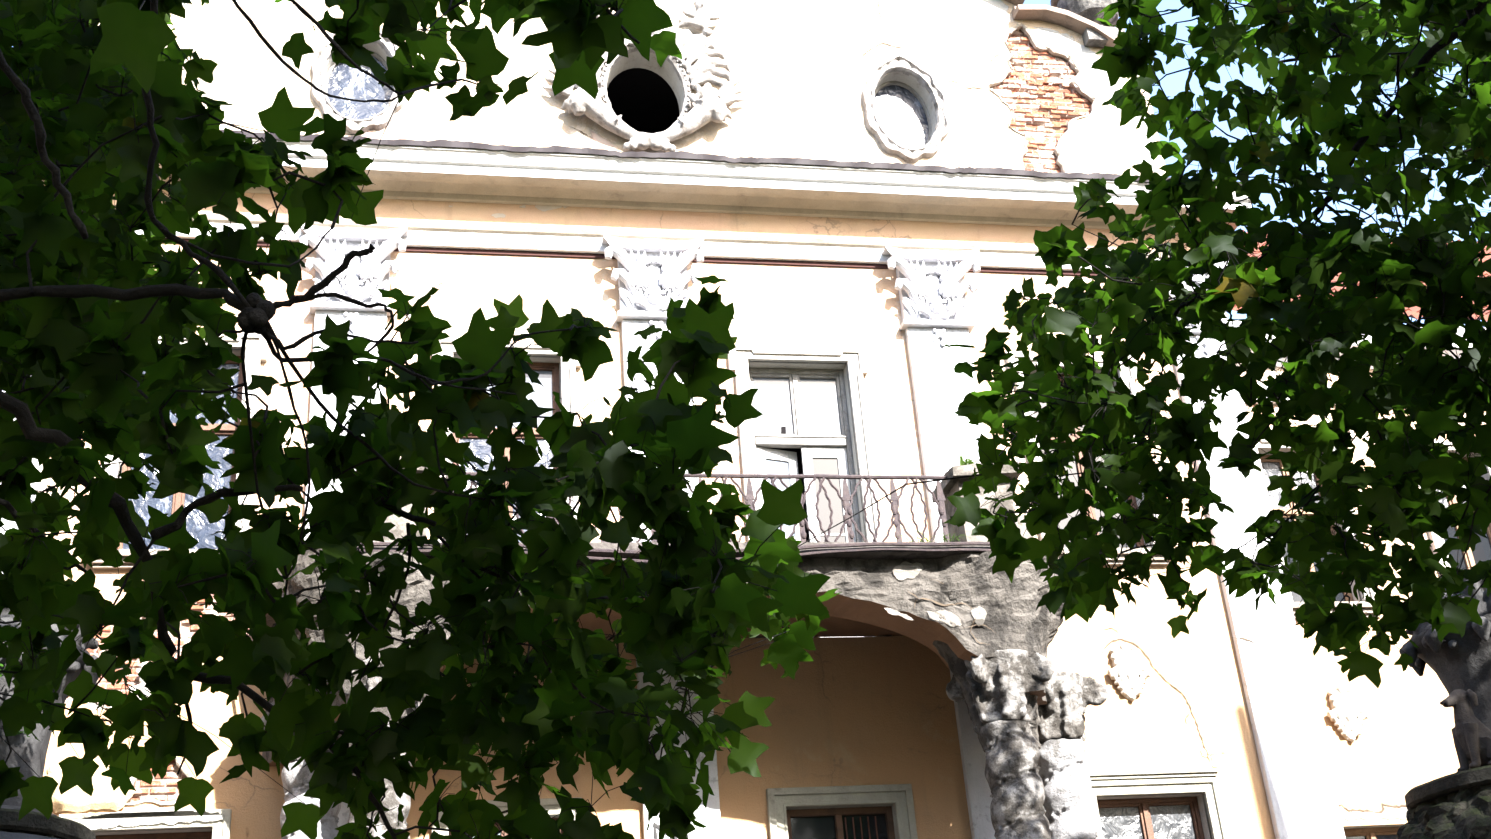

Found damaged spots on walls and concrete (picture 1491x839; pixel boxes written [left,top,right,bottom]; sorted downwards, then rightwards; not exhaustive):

spalling [930,0,1156,173]
crack [1102,627,1226,762]